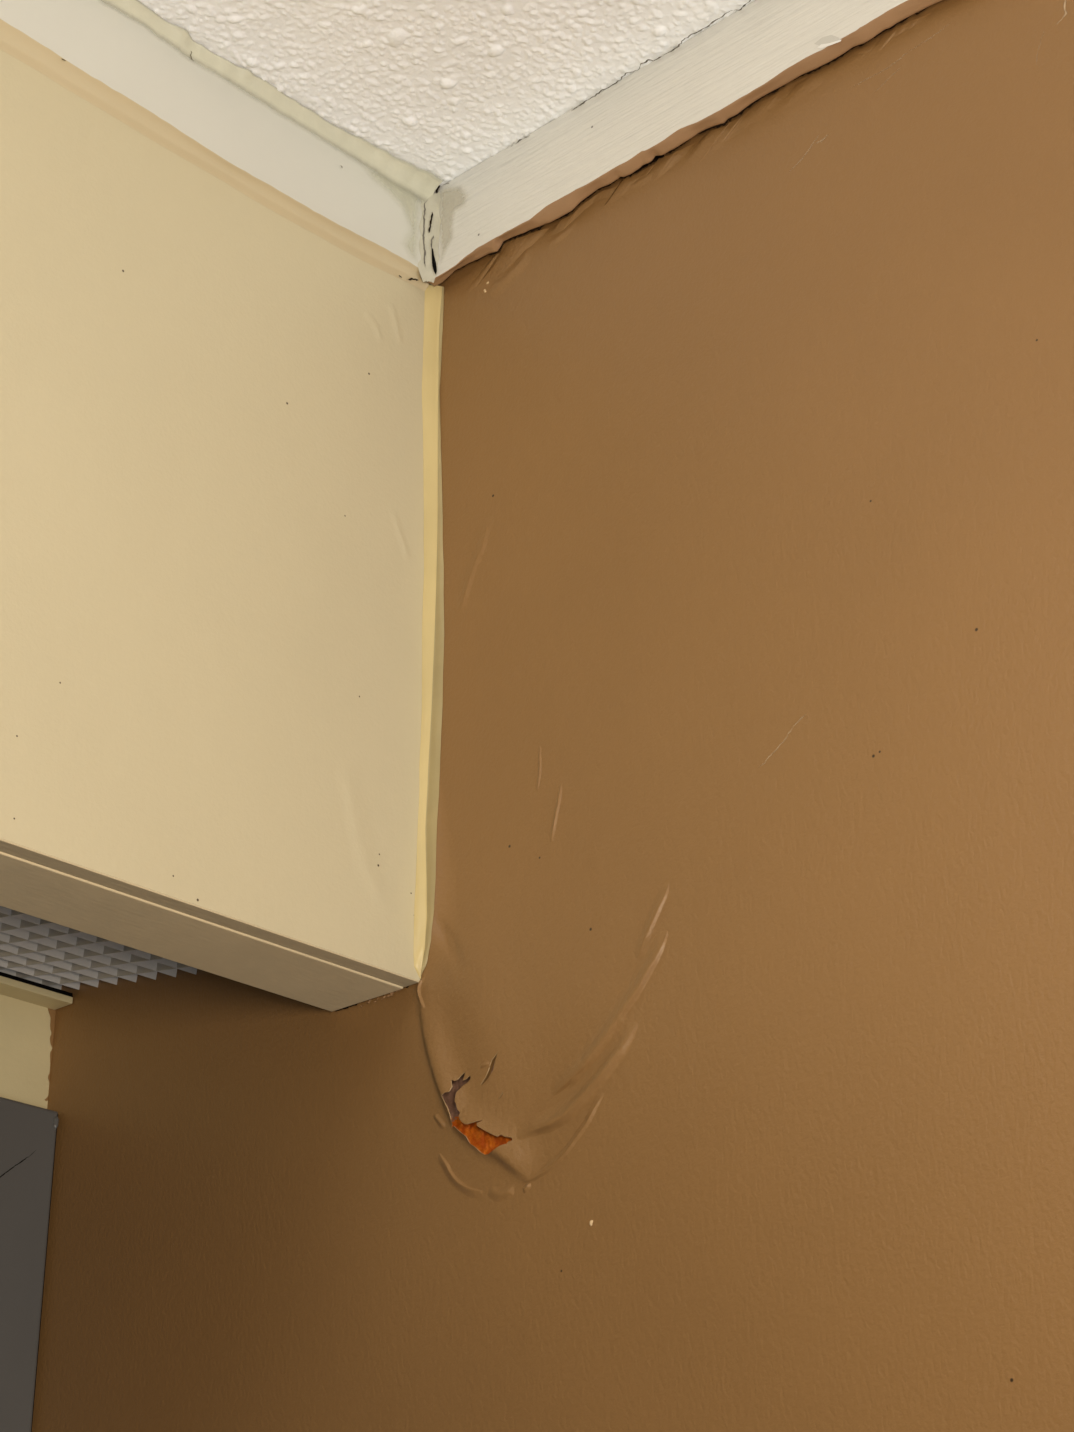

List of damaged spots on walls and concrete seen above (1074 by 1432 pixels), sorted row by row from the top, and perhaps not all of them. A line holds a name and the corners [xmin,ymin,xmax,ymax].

peeling [814,35,841,48]
peeling [441,1073,512,1155]